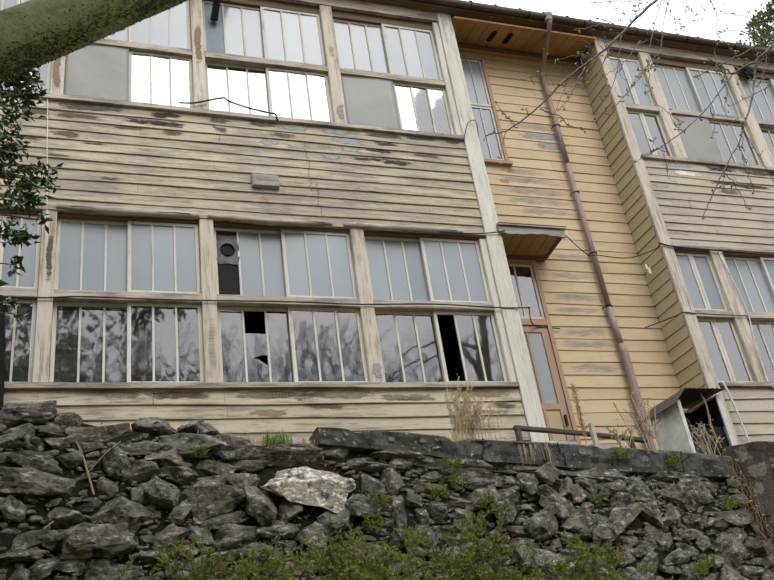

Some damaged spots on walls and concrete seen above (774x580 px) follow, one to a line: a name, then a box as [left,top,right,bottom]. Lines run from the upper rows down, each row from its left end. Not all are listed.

peeling [194,27,203,62]
peeling [53,58,61,87]
peeling [0,98,47,114]
peeling [114,112,184,136]
peeling [262,124,308,149]
peeling [322,129,438,166]
peeling [99,391,207,400]